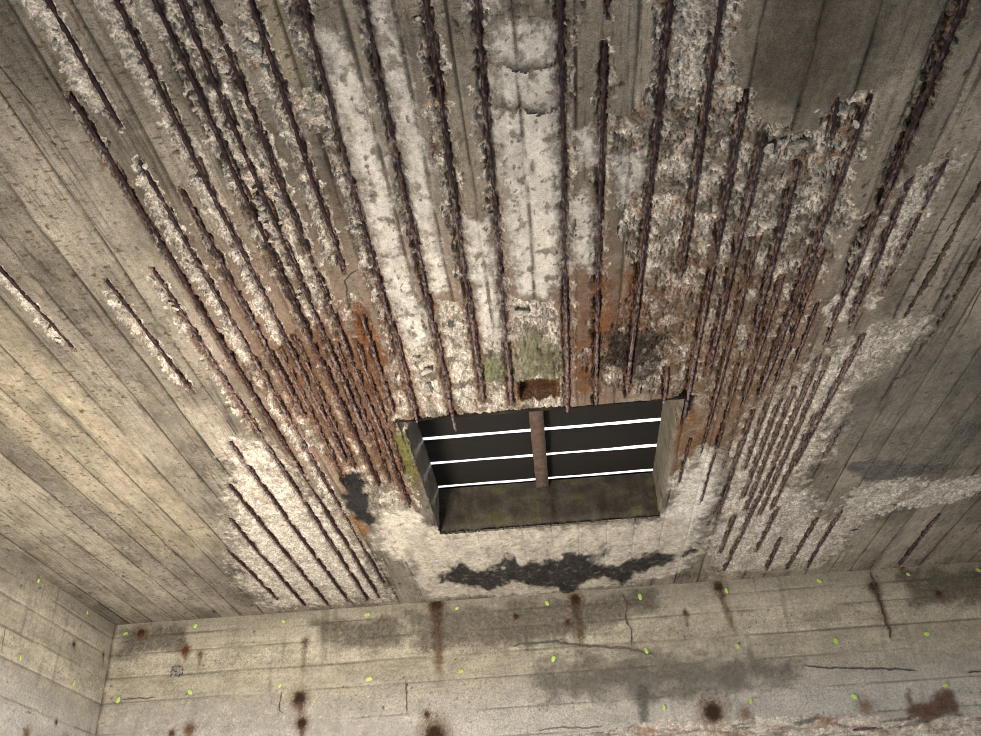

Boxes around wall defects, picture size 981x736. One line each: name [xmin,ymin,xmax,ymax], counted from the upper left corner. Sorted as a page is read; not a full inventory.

spalling [22,0,127,134]
spalling [0,264,81,354]
spalling [63,0,981,612]
water stain [600,325,664,380]
corrosion [282,302,397,475]
water stain [314,443,722,652]
corrosion [428,601,443,671]
crack [804,664,915,672]
crack [868,572,892,640]
corrosion [293,691,307,736]
corrosion [420,712,446,736]
corrosion [906,690,960,719]